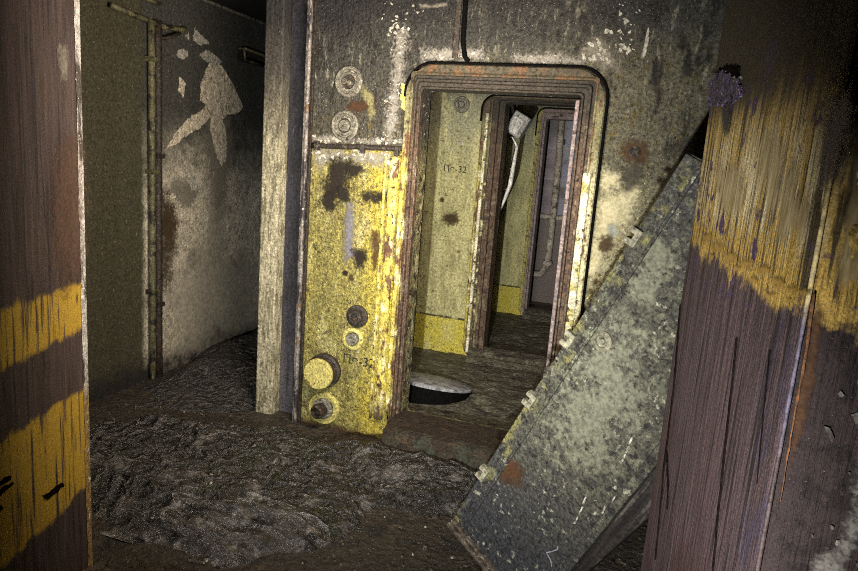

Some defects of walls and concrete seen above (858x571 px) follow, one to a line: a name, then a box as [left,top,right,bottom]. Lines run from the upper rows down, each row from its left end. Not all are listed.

peeling [311,3,489,171]
peeling [511,3,649,72]
corrosion [443,213,459,226]
corrosion [780,293,821,502]
spalling [810,470,858,571]